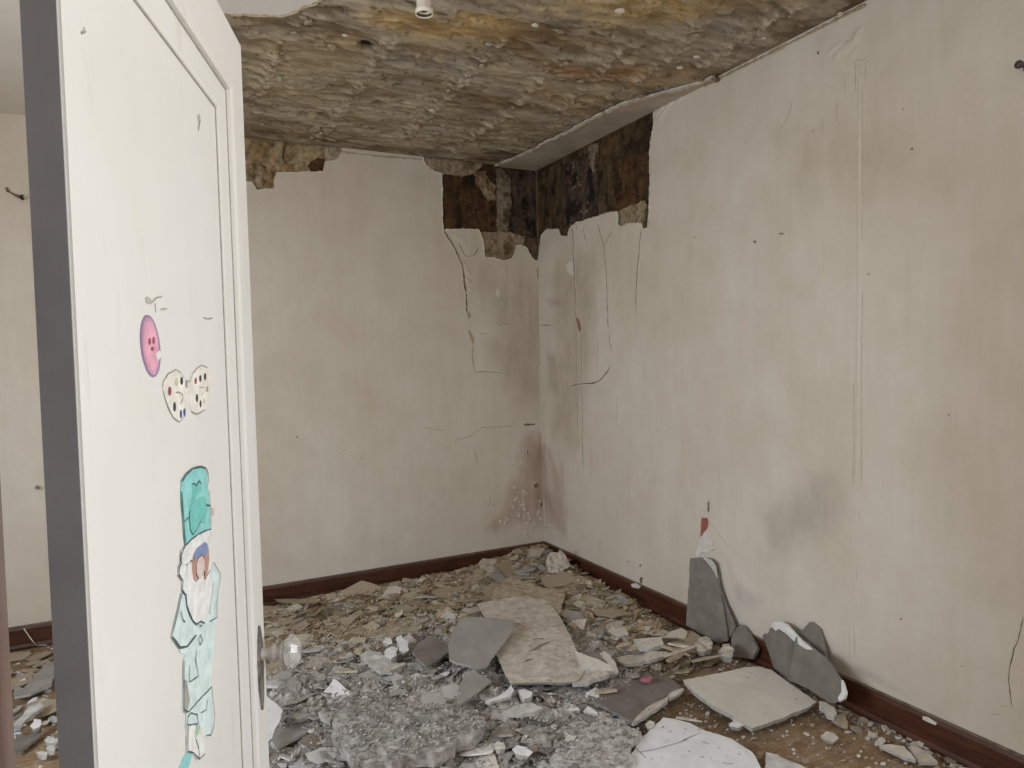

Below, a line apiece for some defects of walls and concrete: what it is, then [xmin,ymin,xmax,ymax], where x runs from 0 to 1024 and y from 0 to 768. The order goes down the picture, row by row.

spalling [422,112,654,262]
crack [443,230,503,375]
crack [570,223,612,479]
crack [634,229,642,311]
peeling [694,516,714,558]
crack [991,617,1024,715]